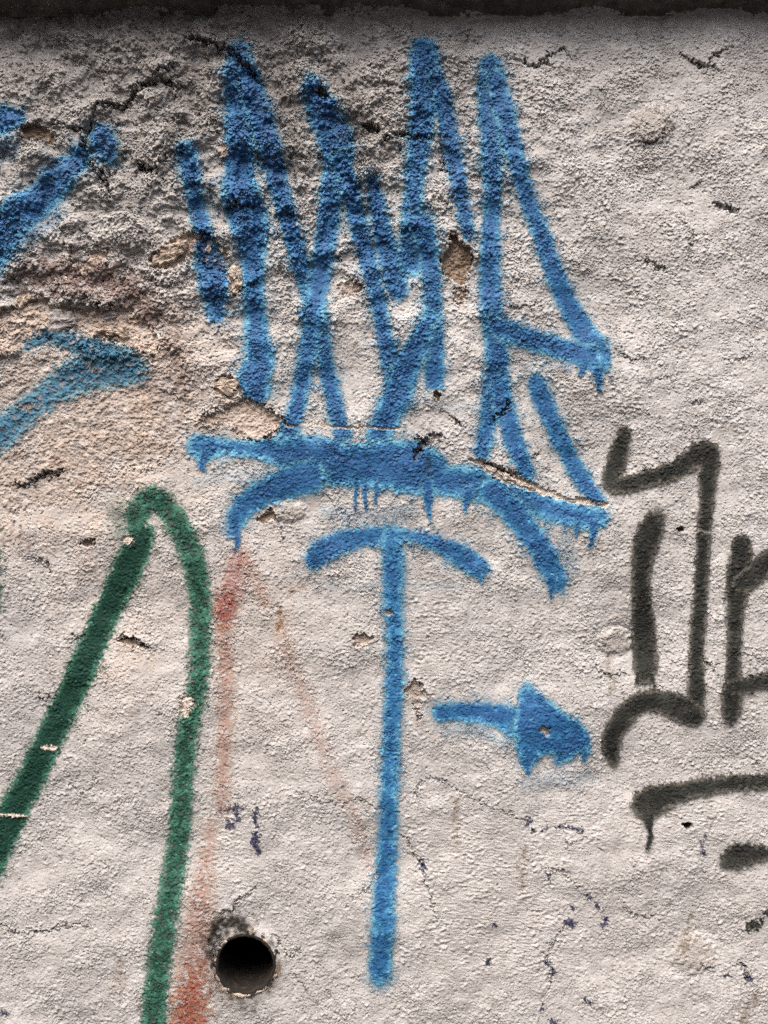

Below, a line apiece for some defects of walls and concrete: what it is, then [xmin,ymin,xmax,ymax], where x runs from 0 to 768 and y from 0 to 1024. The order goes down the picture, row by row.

spalling [439,231,478,305]
spalling [352,632,374,647]
peeling [404,678,428,721]